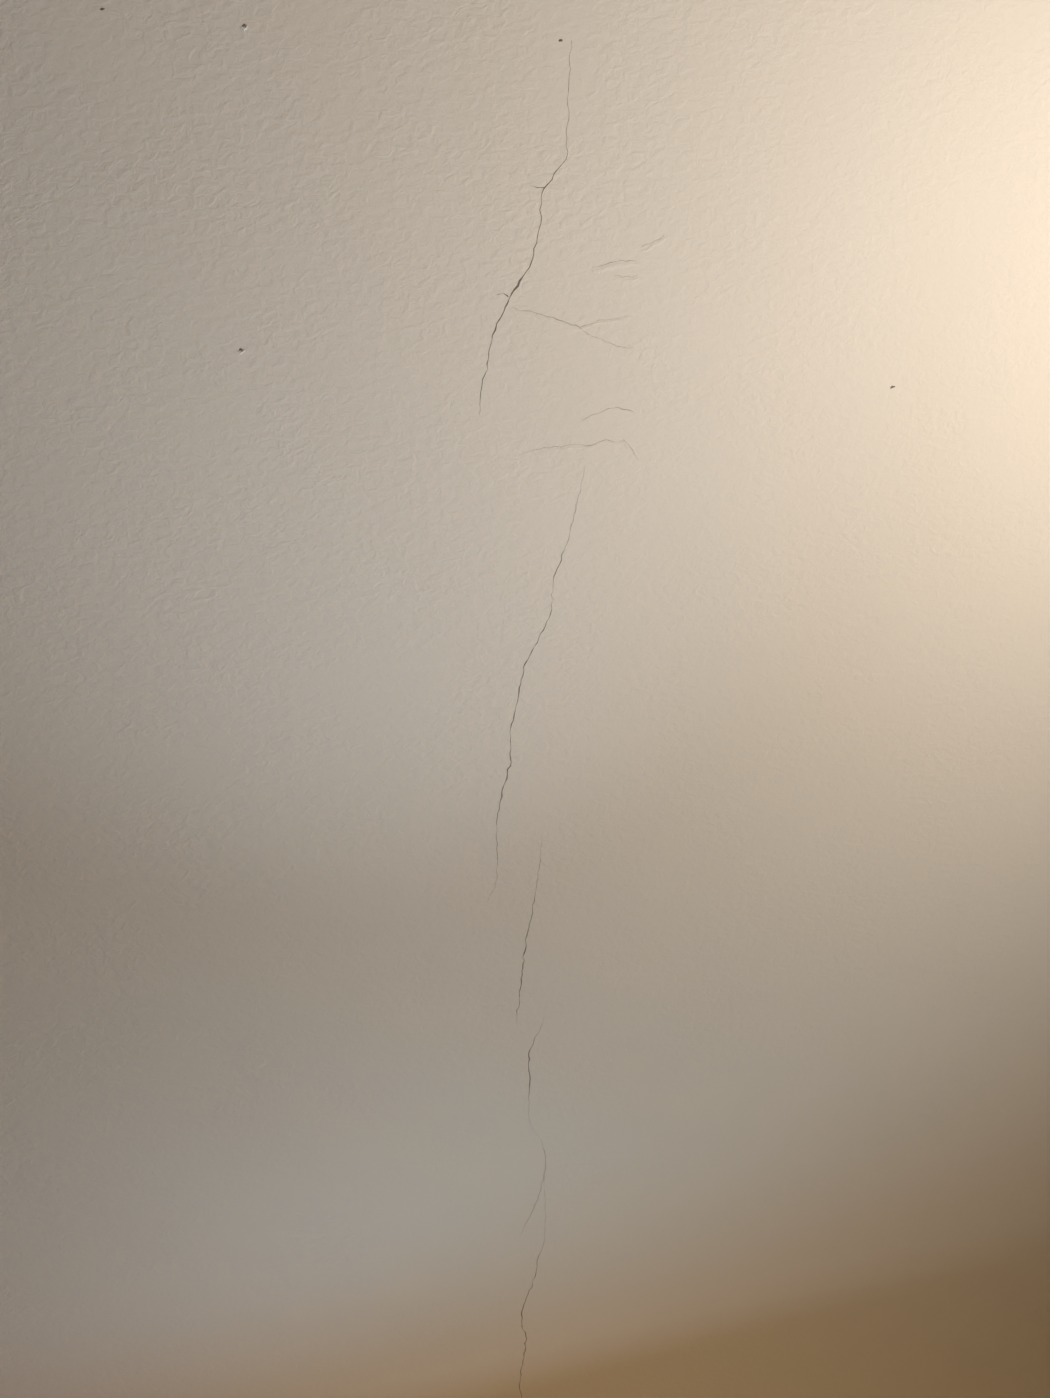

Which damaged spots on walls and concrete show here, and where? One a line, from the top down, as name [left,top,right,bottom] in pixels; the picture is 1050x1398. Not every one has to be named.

crack [480,41,633,399]
crack [490,493,580,895]
crack [516,854,542,1098]
crack [519,1131,546,1396]